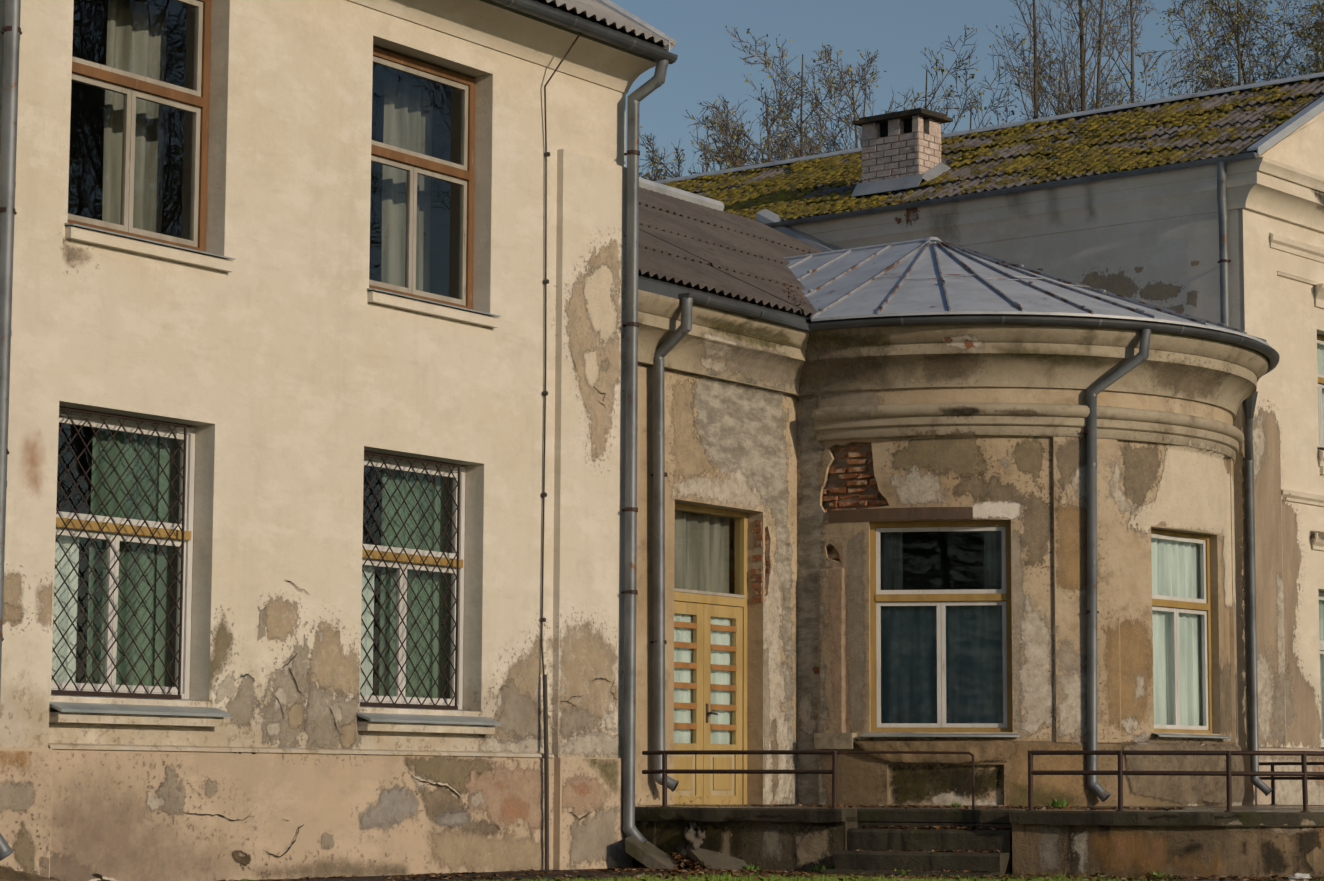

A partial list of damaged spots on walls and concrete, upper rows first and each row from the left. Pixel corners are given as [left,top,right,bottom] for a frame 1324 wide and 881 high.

flaking render [553,233,626,467]
flaking render [1081,267,1199,313]
flaking render [822,426,1104,598]
flaking render [3,573,23,631]
flaking render [146,761,188,815]
flaking render [212,594,360,758]
flaking render [404,612,623,873]
peeling [670,462,854,804]
flaking render [1012,595,1154,745]
flaking render [1107,401,1324,840]